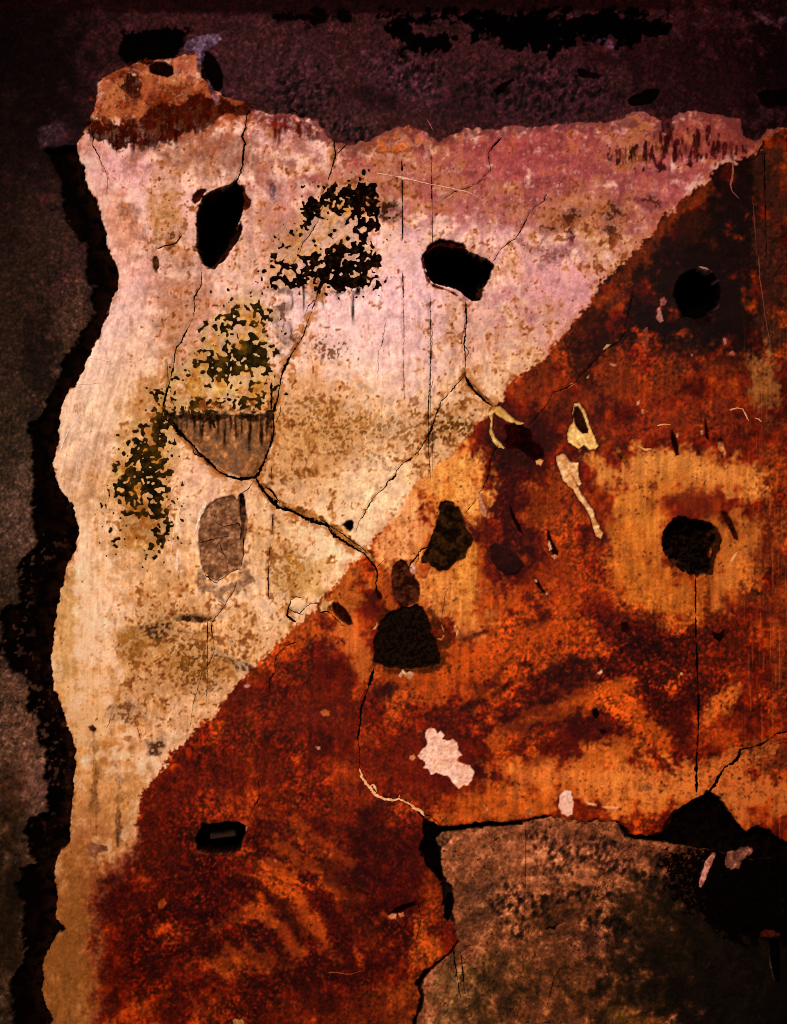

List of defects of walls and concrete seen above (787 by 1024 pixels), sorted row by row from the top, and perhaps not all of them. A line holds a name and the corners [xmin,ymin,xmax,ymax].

corrosion [86,65,252,152]
corrosion [376,127,432,153]
peeling [99,169,391,568]
corrosion [122,502,160,540]
water stain [167,411,275,477]
crack [162,272,493,692]
spalling [373,501,475,680]
crack [694,578,787,792]
crack [357,668,440,832]
peeling [410,728,475,789]
spalling [423,805,534,881]
spalling [634,791,787,887]